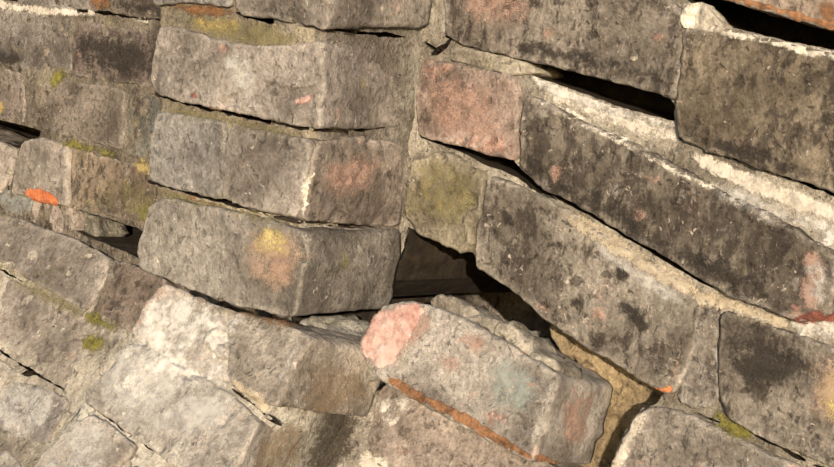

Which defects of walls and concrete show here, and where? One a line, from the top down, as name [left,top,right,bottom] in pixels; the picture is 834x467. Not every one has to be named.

crack [0,350,64,390]